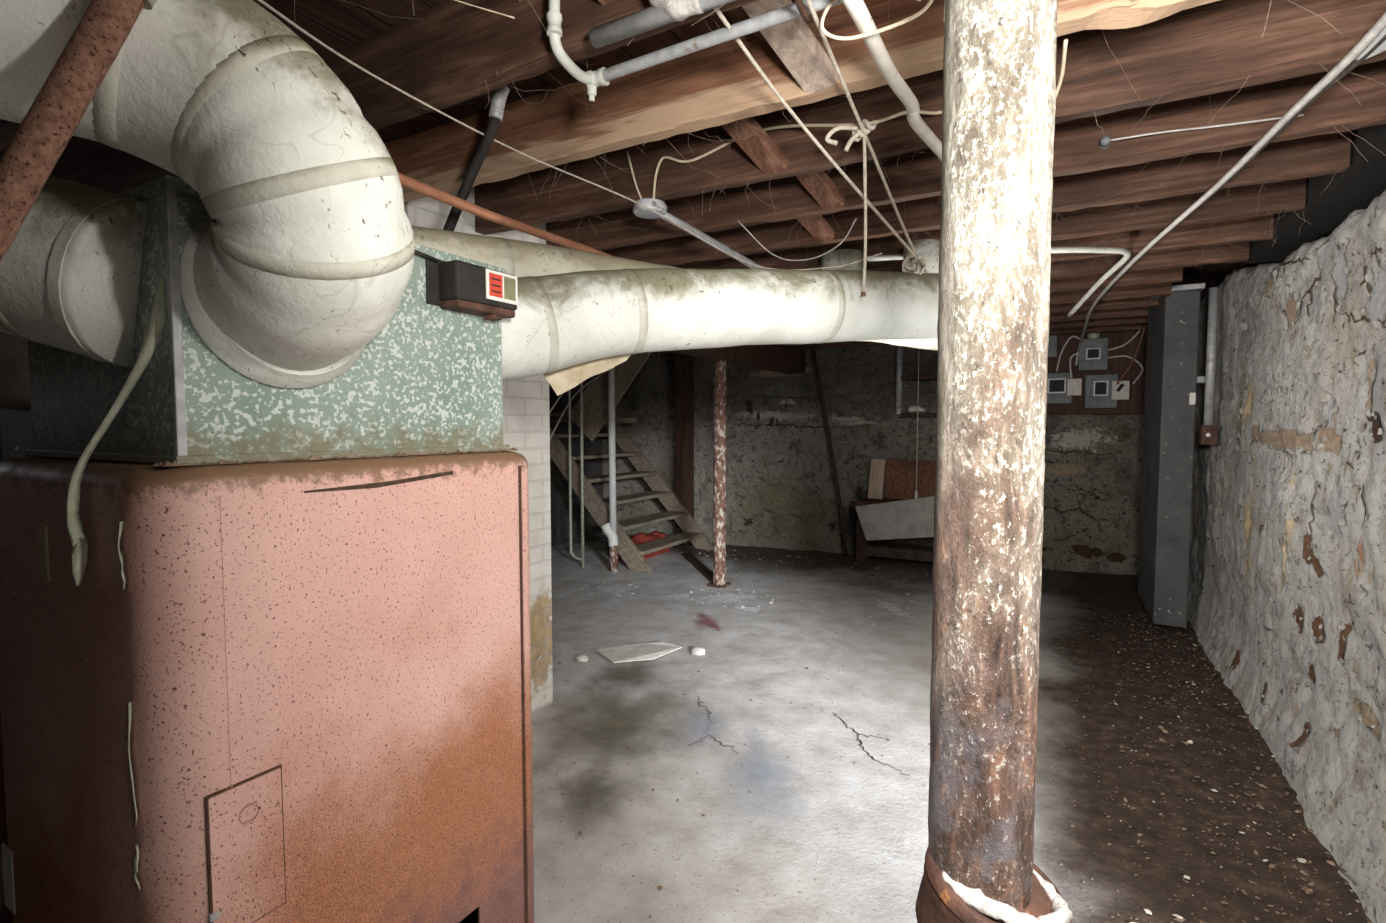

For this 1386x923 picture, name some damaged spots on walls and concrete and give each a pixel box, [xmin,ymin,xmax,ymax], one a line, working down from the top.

peeling [1330,239,1386,443]
peeling [1237,392,1342,455]
crack [1043,446,1122,532]
spalling [1300,534,1324,578]
spalling [1293,604,1352,666]
crack [689,696,739,754]
crack [834,713,910,776]
spalling [1290,714,1310,751]